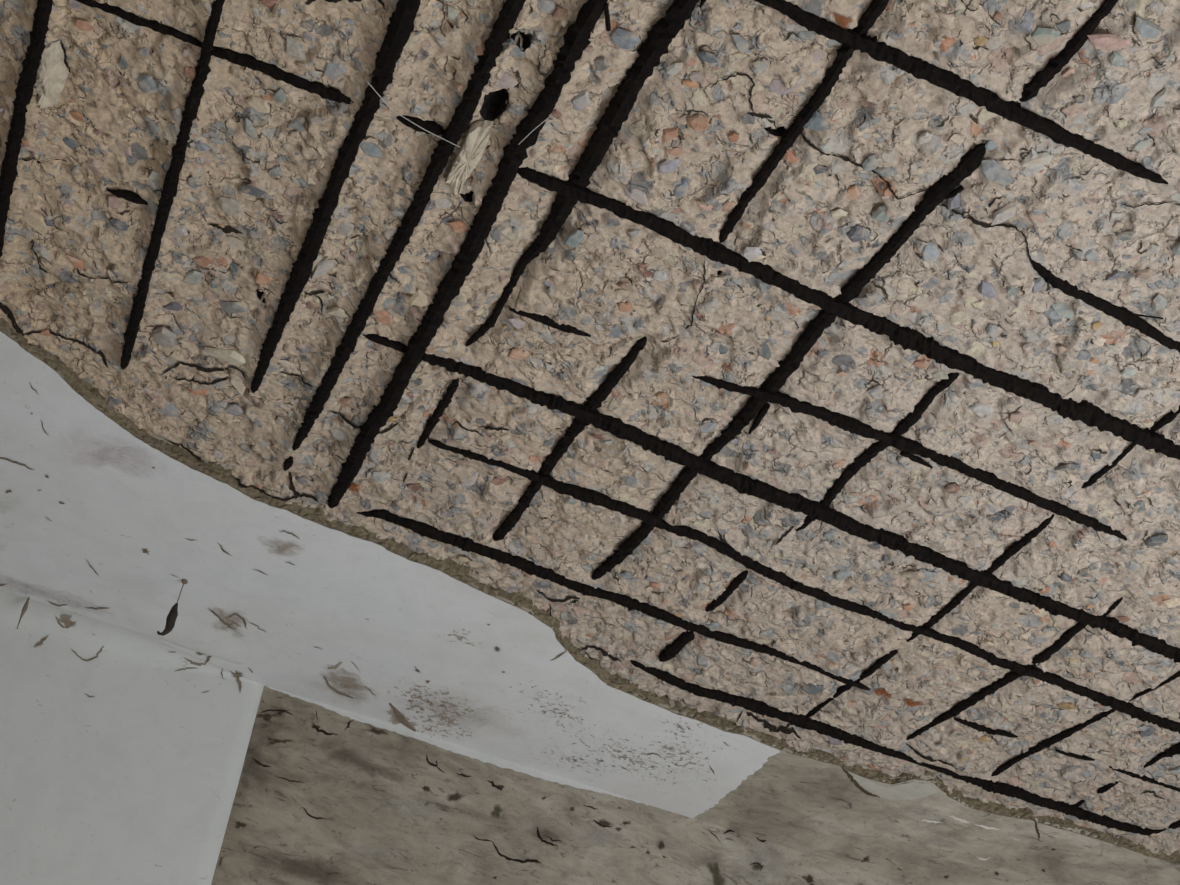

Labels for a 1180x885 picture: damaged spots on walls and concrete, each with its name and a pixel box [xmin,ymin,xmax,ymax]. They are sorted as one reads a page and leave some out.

spalling [0,0,54,257]
spalling [95,0,225,370]
spalling [251,0,421,393]
crack [710,72,773,119]
crack [801,133,1032,261]
crack [0,302,108,368]
crack [162,362,248,385]
spalling [292,0,1180,663]
crack [166,440,319,502]
spalling [356,418,1180,740]
crack [733,711,801,739]
spalling [630,660,1166,836]